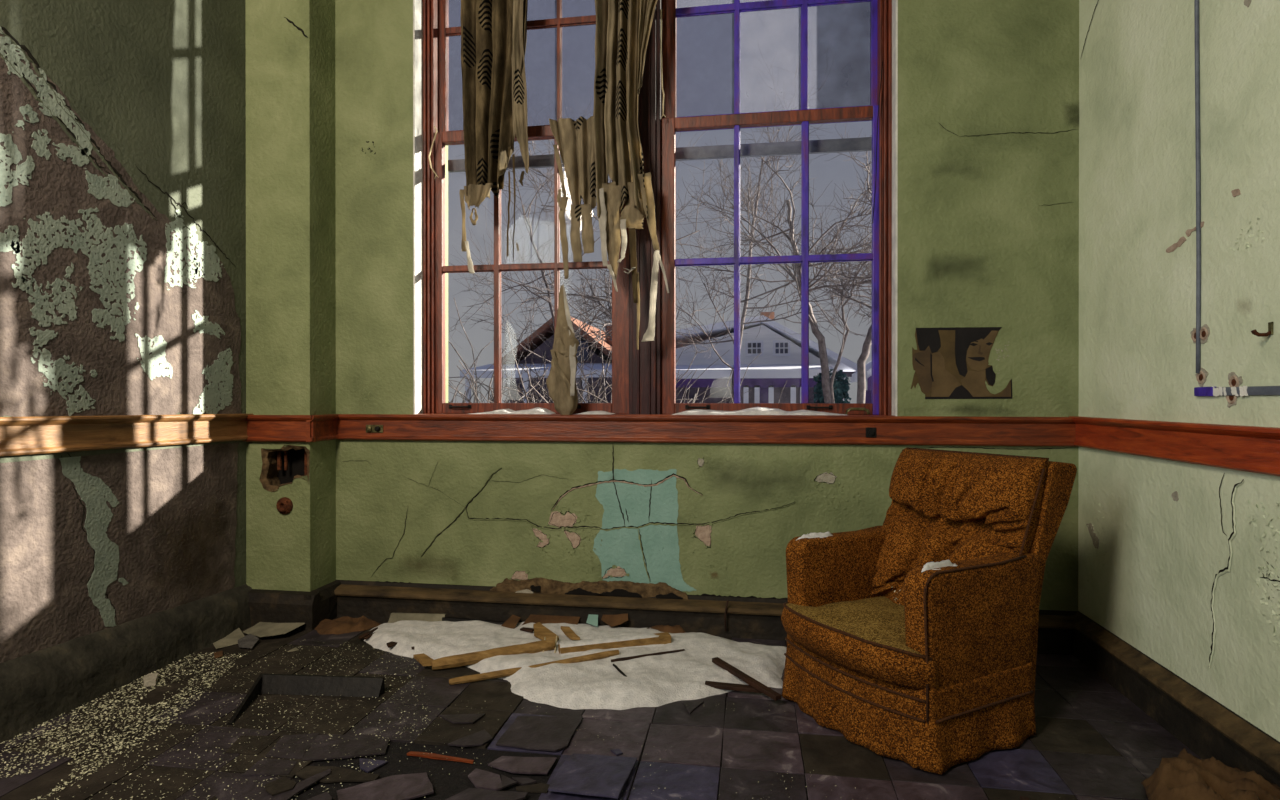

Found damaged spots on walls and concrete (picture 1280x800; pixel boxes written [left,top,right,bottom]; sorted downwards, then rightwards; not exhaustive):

flaking render [0,26,242,417]
flaking render [0,442,239,663]
spalling [259,445,309,492]
crack [373,447,796,585]
spalling [490,565,688,599]
crack [1209,473,1245,668]